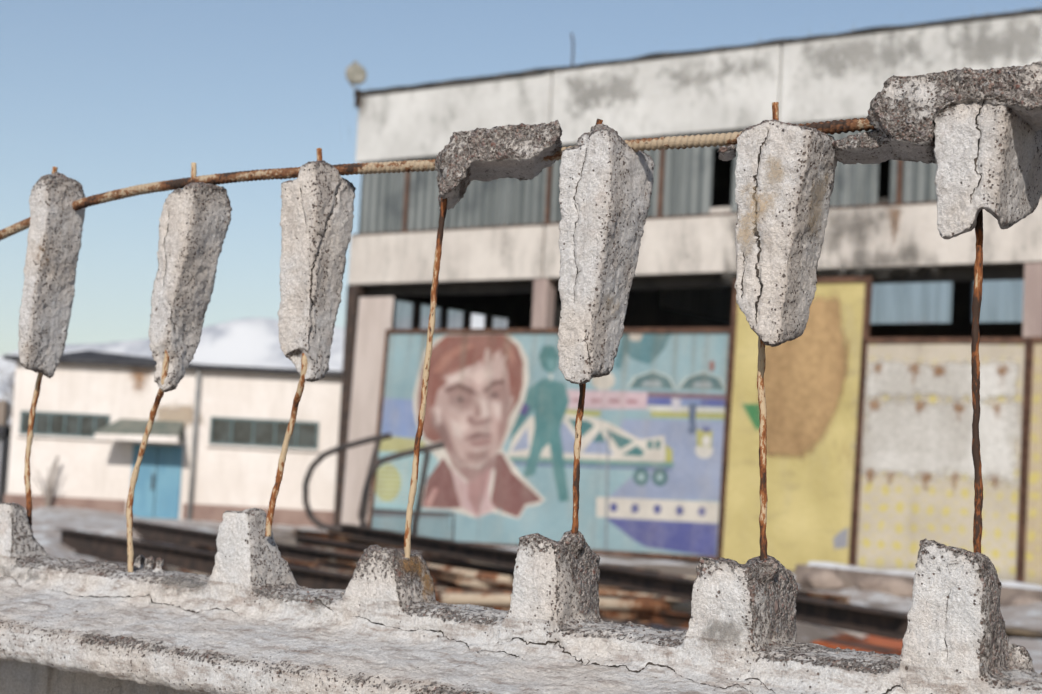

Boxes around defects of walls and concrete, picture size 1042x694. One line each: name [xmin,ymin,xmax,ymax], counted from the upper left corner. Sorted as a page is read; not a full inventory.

spalling [0,217,31,241]
spalling [72,167,300,211]
spalling [333,159,436,176]
spalling [624,131,742,152]
crack [740,130,769,325]
spalling [799,118,876,135]
crack [970,98,1005,203]
peeling [764,297,848,456]
peeling [861,359,1020,485]
crack [52,589,239,615]
crack [314,598,776,694]
spalling [985,561,1028,679]